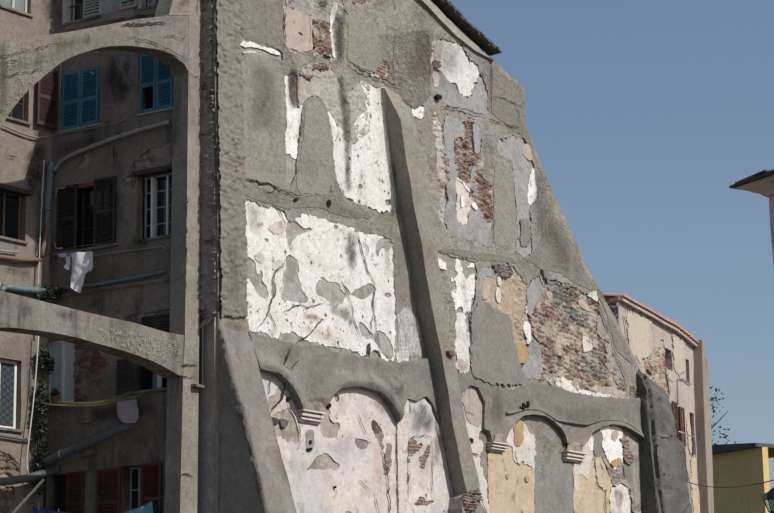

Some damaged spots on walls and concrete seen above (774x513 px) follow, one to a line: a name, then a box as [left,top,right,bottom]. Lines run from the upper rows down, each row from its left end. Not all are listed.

crack [0,42,65,77]
flaking render [240,0,392,213]
spalling [411,106,494,230]
flaking render [430,40,480,98]
crack [182,201,190,292]
flaking render [245,199,423,363]
crack [340,233,402,374]
spalling [438,252,637,399]
peeling [307,453,339,470]
spalling [407,439,430,468]
flaking render [461,386,536,513]
flaking render [572,425,641,513]